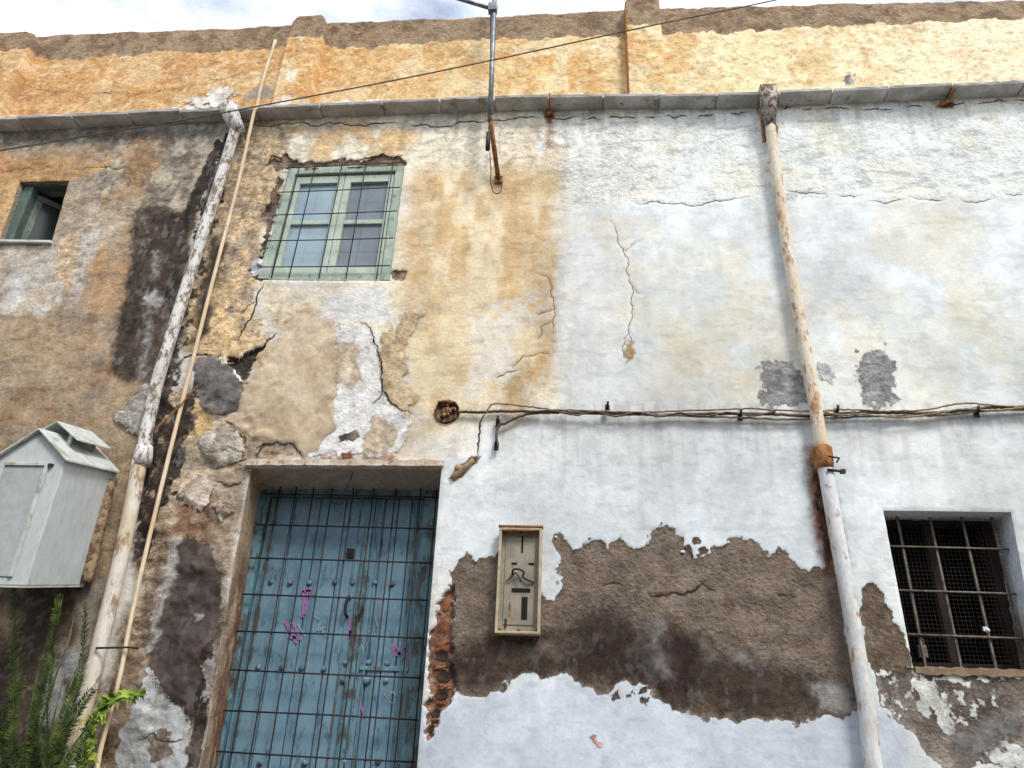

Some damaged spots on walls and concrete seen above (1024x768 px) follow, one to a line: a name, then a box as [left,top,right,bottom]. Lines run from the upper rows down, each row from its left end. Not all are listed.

crack [254,112,743,127]
damp [111,132,240,562]
crack [181,285,264,361]
peeling [307,322,413,458]
crack [361,322,415,417]
crack [609,218,641,361]
peeling [755,359,808,412]
peeling [855,342,900,410]
corrosion [806,447,835,573]
damp [148,534,223,768]
spalling [430,522,857,731]
spalling [860,582,1024,768]